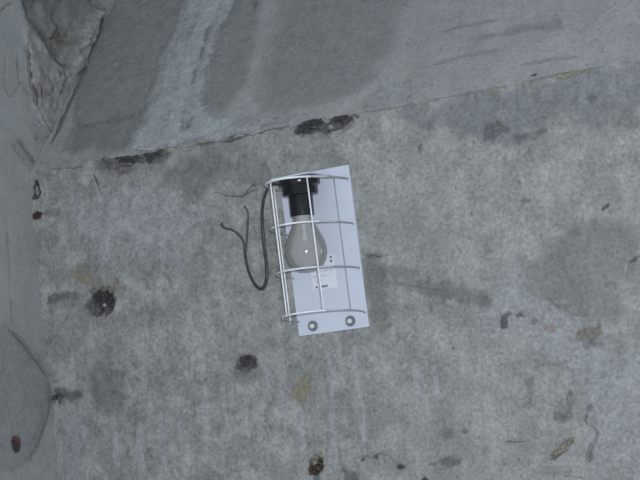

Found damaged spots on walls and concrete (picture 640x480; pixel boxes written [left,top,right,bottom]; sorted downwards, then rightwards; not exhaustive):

crack [26,15,105,145]
crack [186,126,297,148]
spalling [295,114,363,137]
spalling [96,149,168,175]
spalling [86,286,116,317]
spalling [234,355,258,374]
corrosion [11,436,21,453]
corrosion [308,452,323,480]